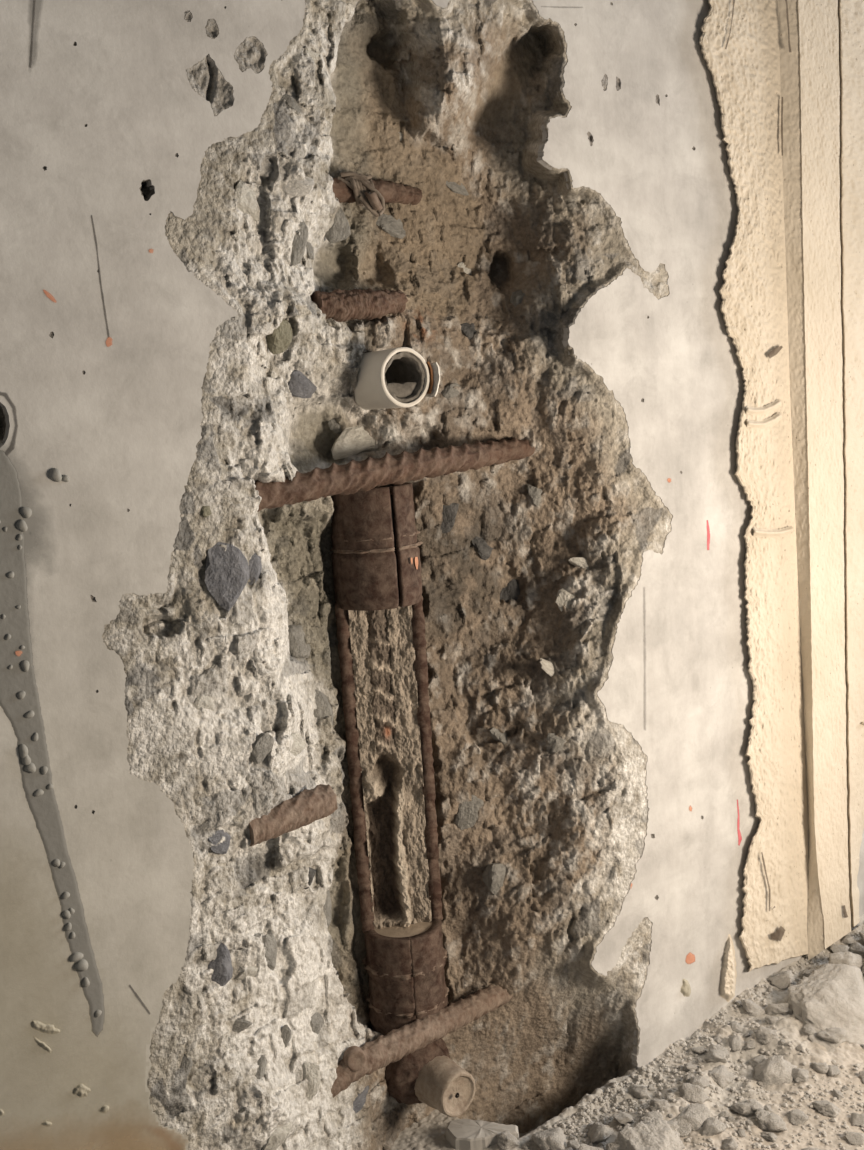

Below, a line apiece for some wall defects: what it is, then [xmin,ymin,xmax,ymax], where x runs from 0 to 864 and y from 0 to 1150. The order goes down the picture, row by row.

spalling [102,0,673,1150]